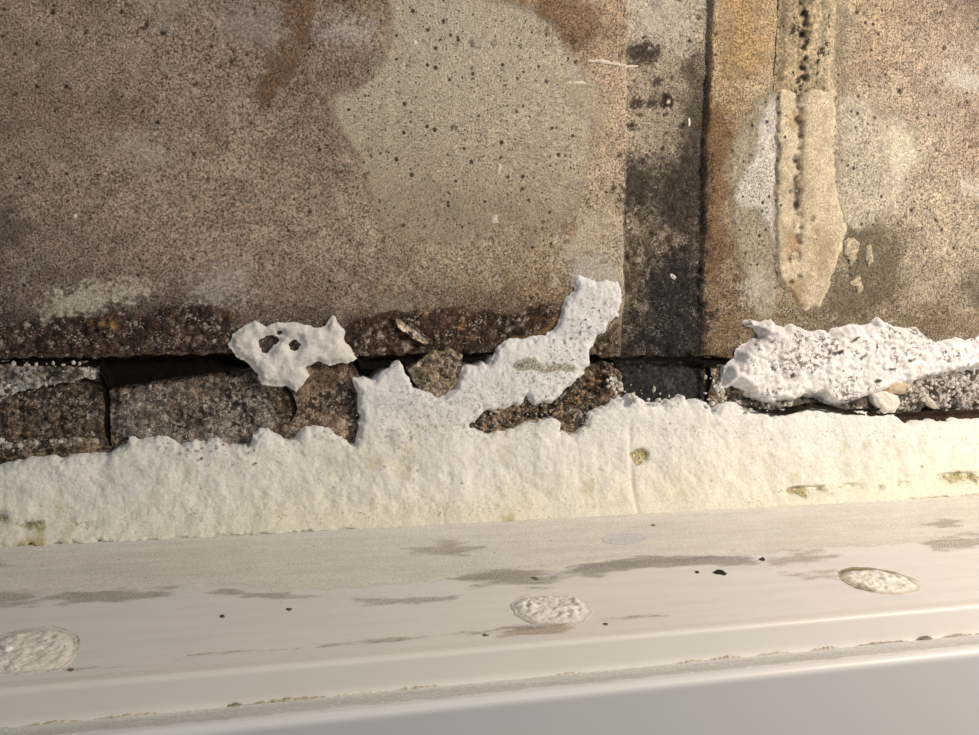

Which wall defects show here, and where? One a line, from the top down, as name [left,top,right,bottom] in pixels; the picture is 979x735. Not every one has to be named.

rust [260,0,315,105]
water stain [209,0,719,372]
rust [696,106,732,280]
spalling [0,303,559,445]
spalling [595,324,621,358]